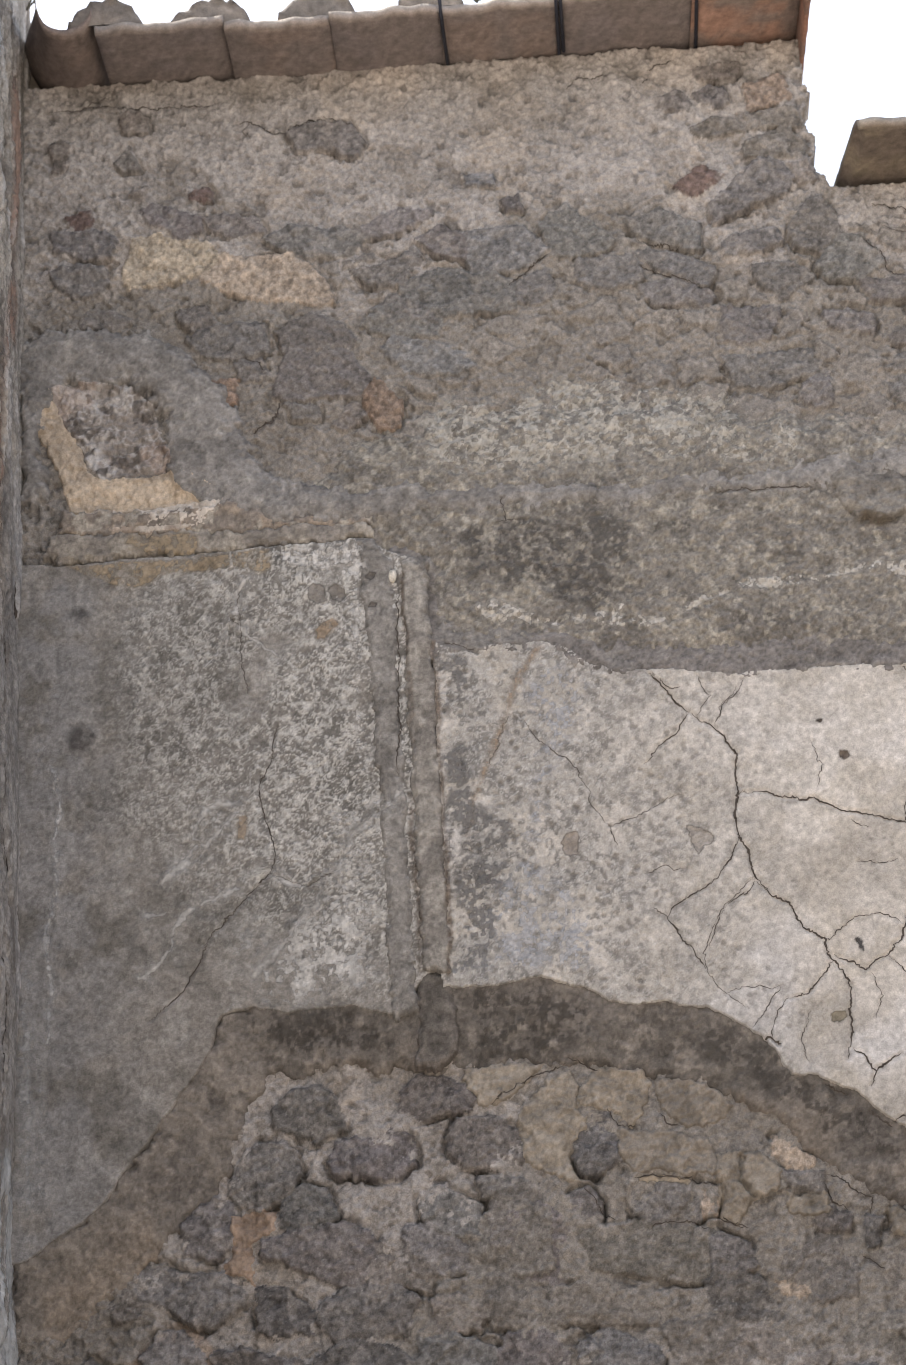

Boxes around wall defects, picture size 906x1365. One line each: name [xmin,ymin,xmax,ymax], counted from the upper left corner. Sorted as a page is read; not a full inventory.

peeling [36,381,223,534]
spalling [308,583,345,604]
crack [137,576,402,1020]
crack [488,718,681,845]
crack [645,673,906,1127]
spalling [831,1011,847,1022]
crack [492,1057,598,1104]
crack [607,1109,678,1128]
peeling [461,1062,833,1227]
peeling [224,1209,279,1287]
peeling [884,1206,906,1237]